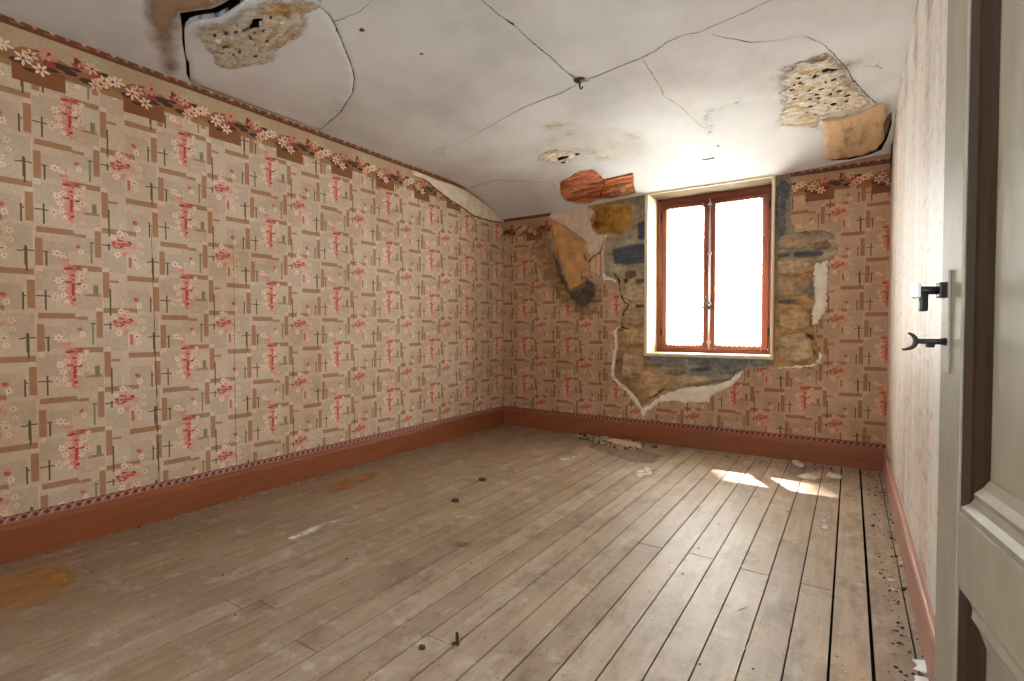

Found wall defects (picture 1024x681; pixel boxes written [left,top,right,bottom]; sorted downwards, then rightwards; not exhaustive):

spalling [198,0,320,69]
crack [318,3,369,131]
crack [432,0,883,154]
spalling [777,53,870,130]
leakage [538,232,598,316]
flaking render [538,149,839,407]